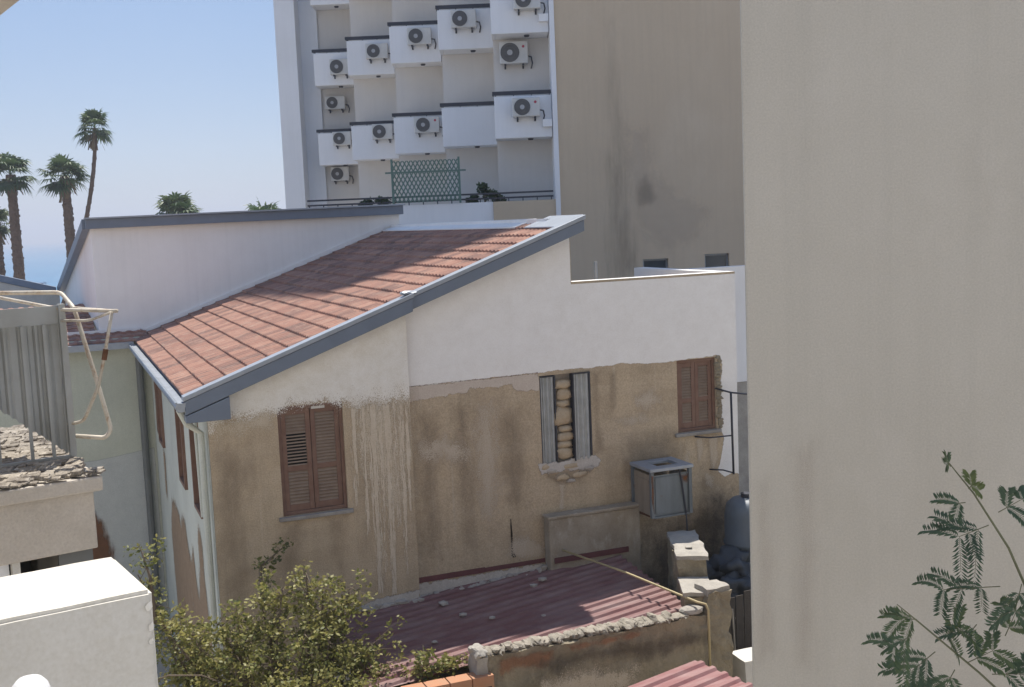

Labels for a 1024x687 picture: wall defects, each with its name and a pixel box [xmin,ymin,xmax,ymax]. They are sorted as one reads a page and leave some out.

peeling [163,449,220,685]
damp [336,381,510,596]
spalling [538,378,601,483]